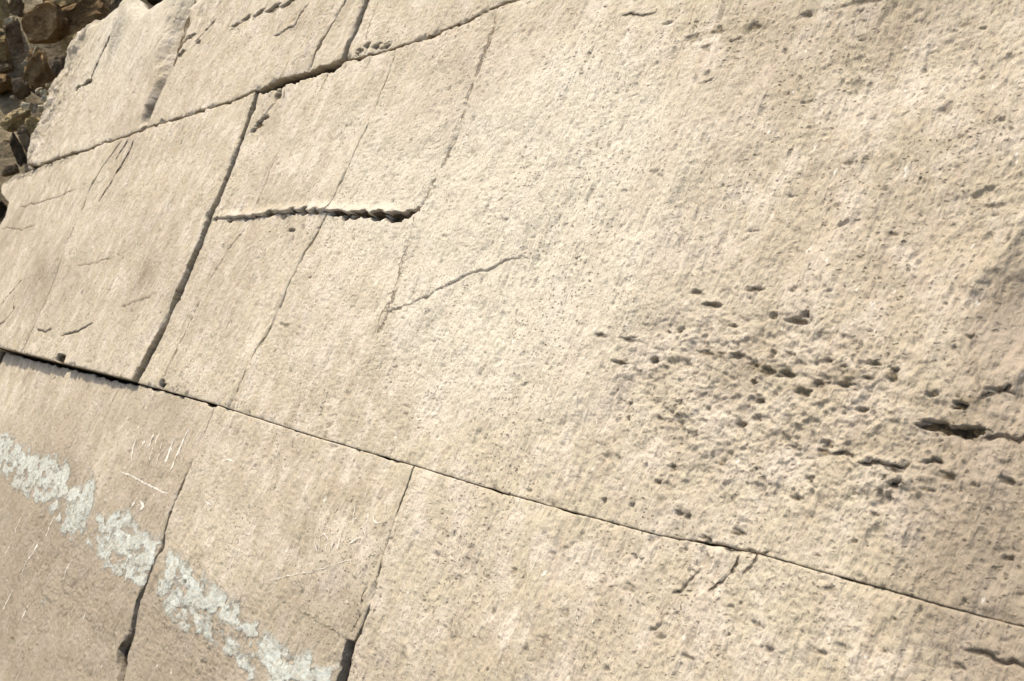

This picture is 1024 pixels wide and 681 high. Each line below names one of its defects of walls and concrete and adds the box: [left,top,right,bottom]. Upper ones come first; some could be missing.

crack [461,14,496,120]
crack [163,144,524,381]
water stain [0,431,340,681]
crack [983,434,1024,442]